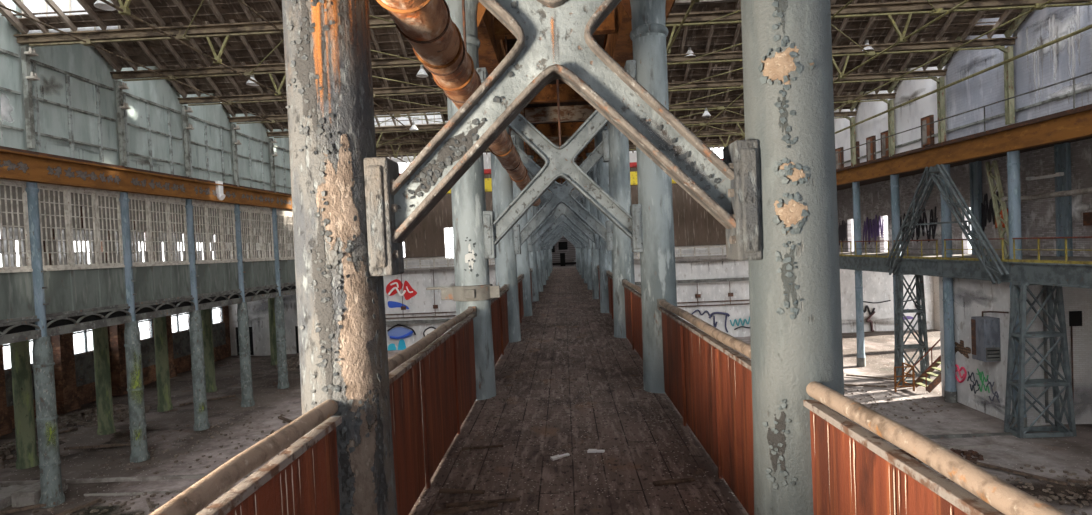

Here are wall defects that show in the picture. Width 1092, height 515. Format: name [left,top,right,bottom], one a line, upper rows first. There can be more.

rust [312,0,337,55]
peeling [287,0,389,515]
peeling [758,0,809,320]
peeling [762,399,797,489]